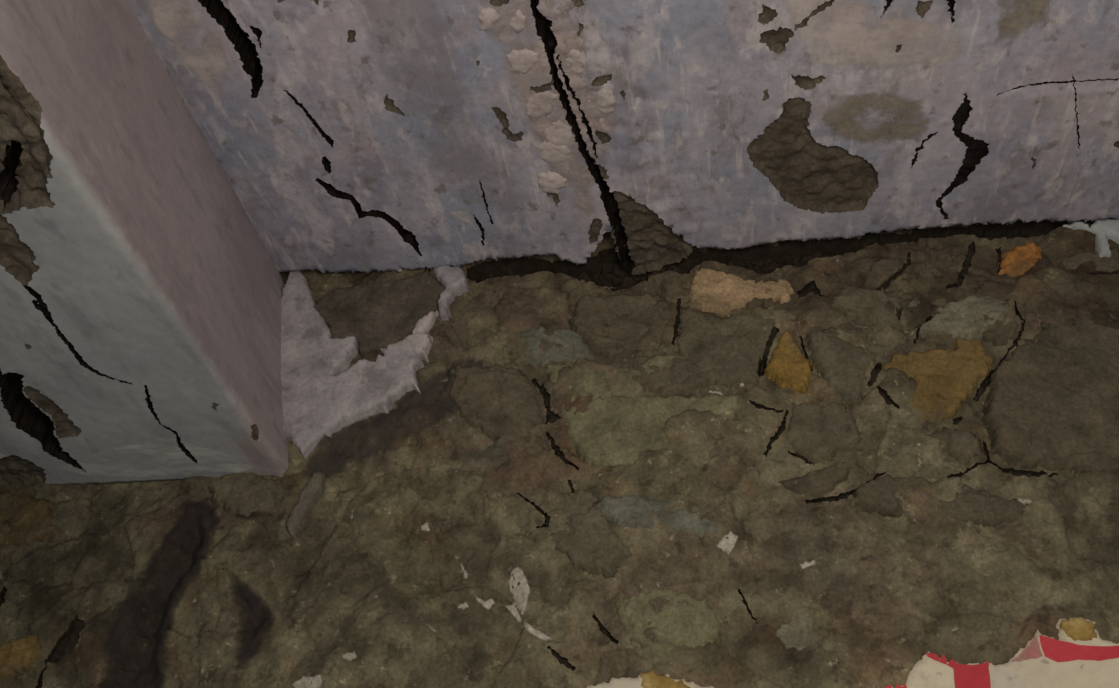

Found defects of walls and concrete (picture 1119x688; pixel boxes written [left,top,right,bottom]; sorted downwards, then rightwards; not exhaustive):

spalling [757,0,834,55]
spalling [916,0,933,18]
spalling [0,55,55,286]
crack [197,0,430,272]
crack [466,0,1119,346]
spalling [747,73,879,214]
crack [0,369,86,472]
crack [23,284,198,463]
spalling [0,191,1119,688]
crack [749,326,815,466]
leakage [98,501,218,688]
leakage [232,582,272,664]